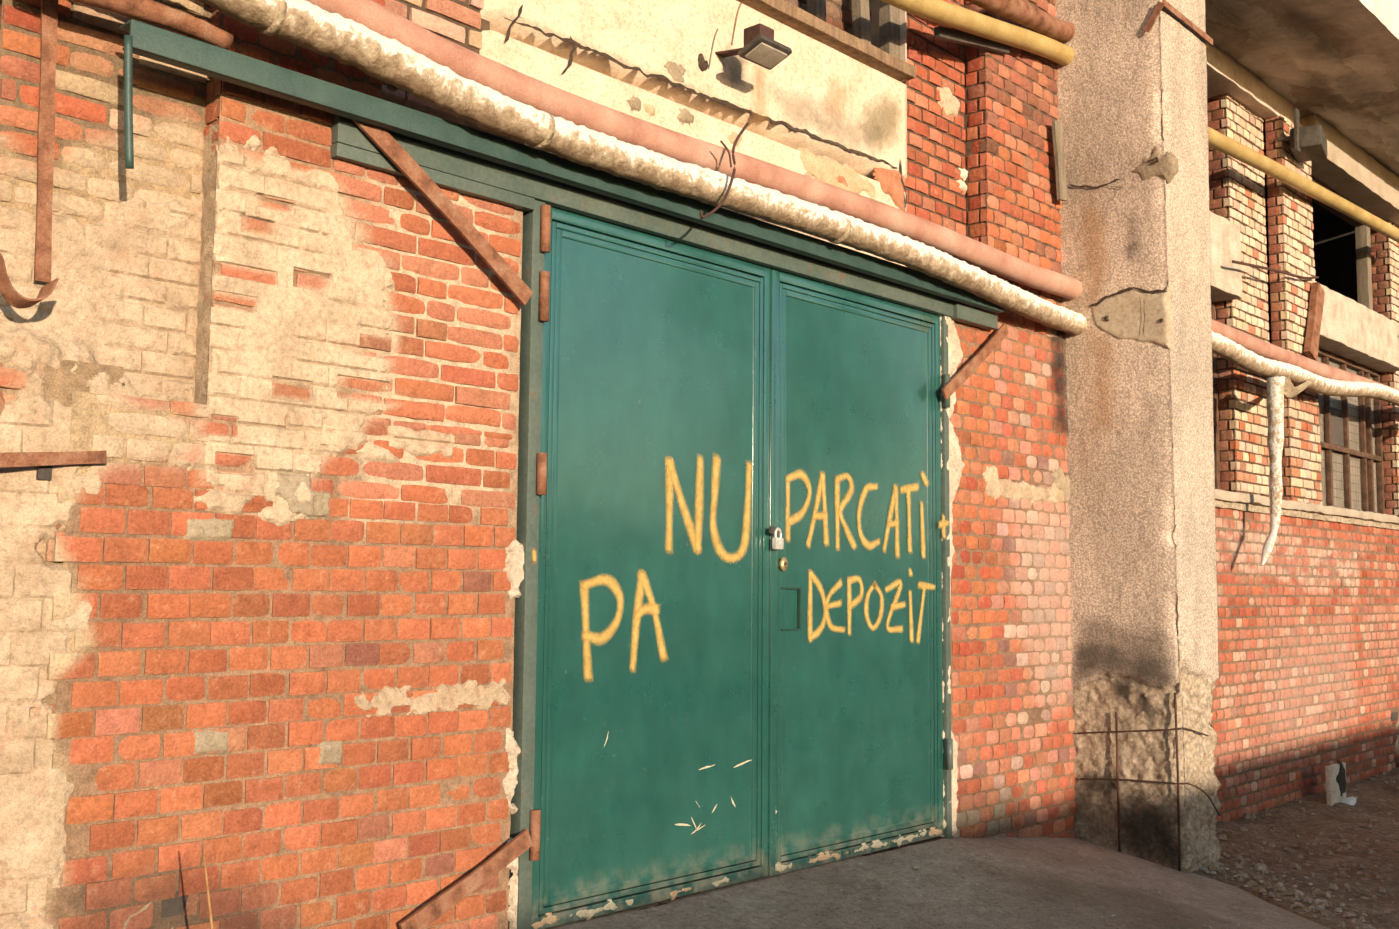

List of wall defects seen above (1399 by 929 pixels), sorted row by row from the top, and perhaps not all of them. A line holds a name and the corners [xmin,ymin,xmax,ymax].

crack [1069,179,1123,189]
spalling [1131,146,1178,184]
crack [1089,287,1167,334]
peeling [940,316,965,641]
peeling [0,135,400,929]
water stain [1078,647,1174,682]
spalling [1073,637,1222,872]
peeling [775,731,959,872]
peeling [531,899,634,929]